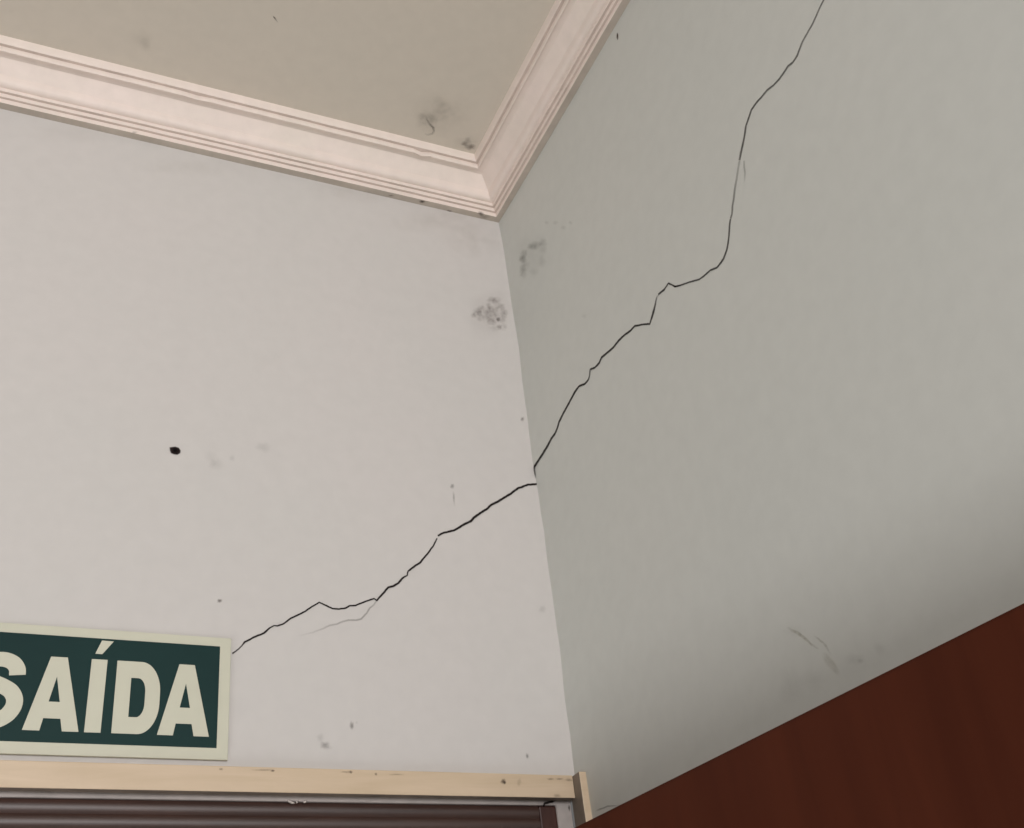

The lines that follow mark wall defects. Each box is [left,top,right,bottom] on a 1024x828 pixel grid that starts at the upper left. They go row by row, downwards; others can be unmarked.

crack [739,0,824,160]
crack [232,219,731,654]